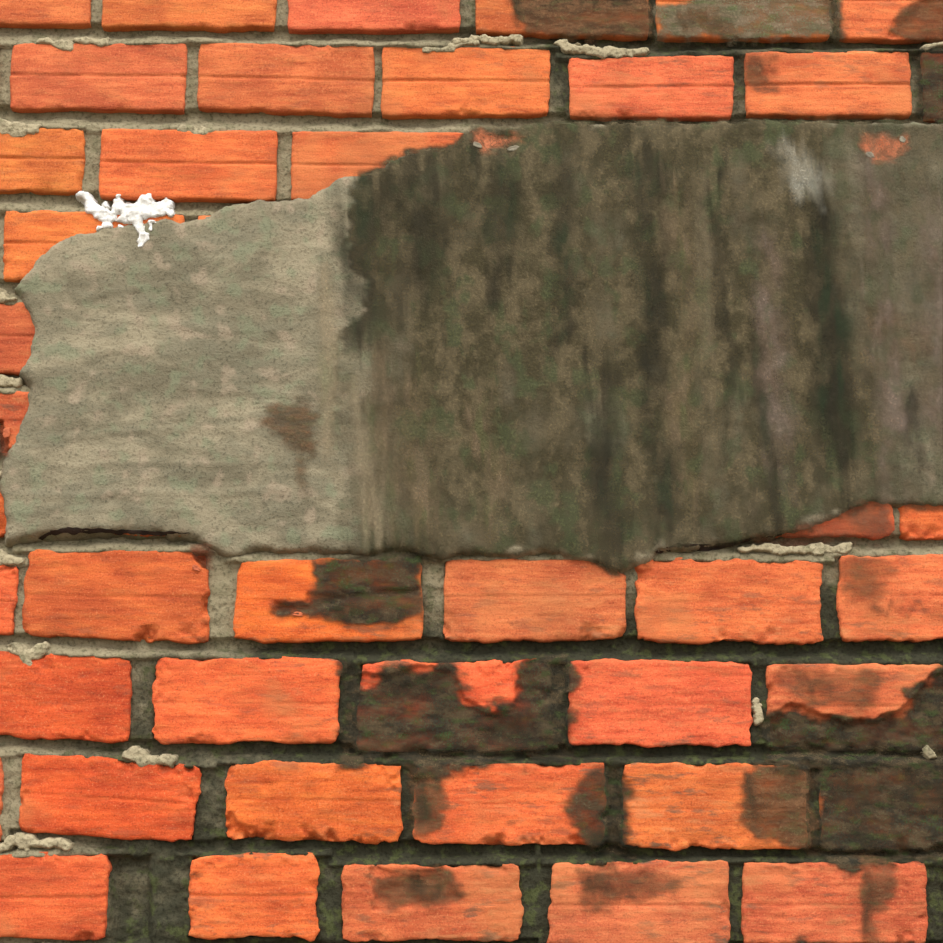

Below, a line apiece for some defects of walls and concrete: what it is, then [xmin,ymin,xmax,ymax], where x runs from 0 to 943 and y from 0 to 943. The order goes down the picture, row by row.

leakage [262,0,943,575]
leakage [740,762,819,851]